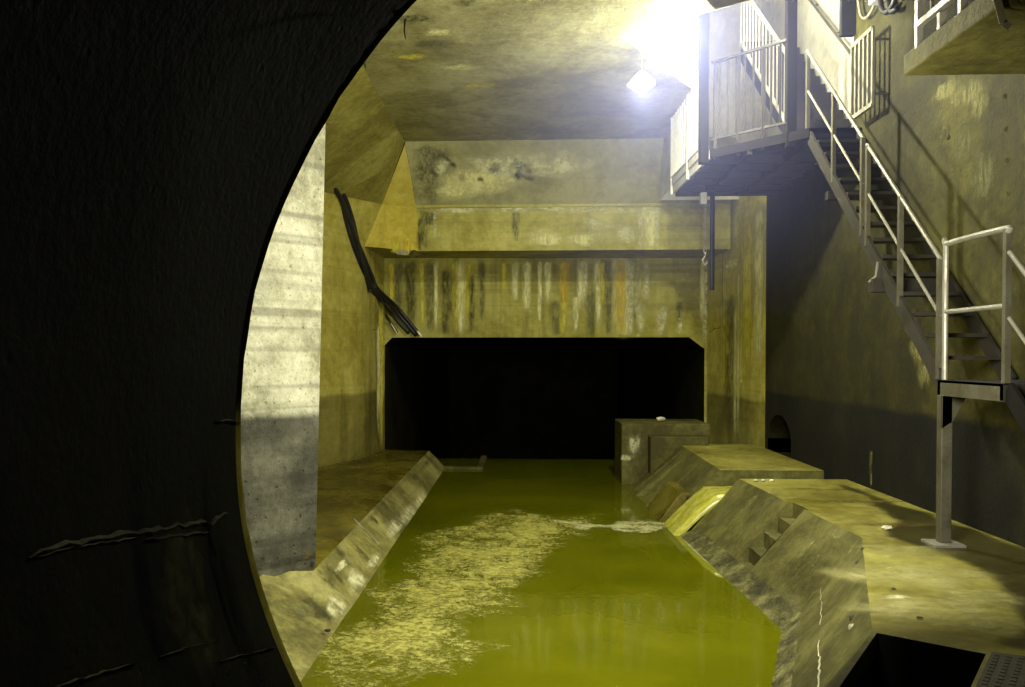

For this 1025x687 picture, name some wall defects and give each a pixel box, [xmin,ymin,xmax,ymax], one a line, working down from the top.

damp [418,147,590,248]
damp [502,262,560,333]
corrosion [559,262,569,333]
damp [573,258,649,335]
crack [28,512,226,559]